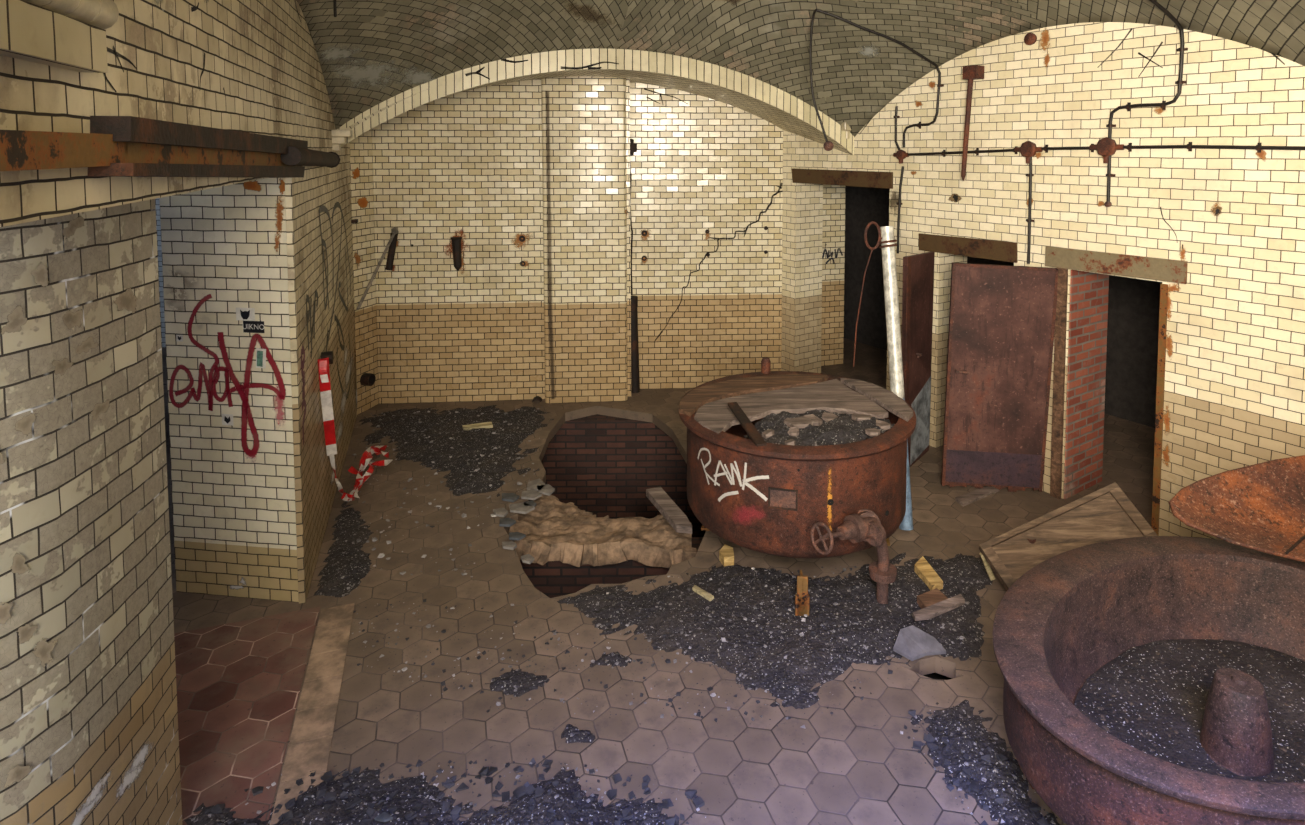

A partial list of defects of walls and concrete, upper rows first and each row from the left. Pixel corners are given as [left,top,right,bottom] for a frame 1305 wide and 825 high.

crack [654,183,783,342]
corrosion [1166,284,1180,357]
spalling [341,343,706,590]
spalling [520,560,669,598]